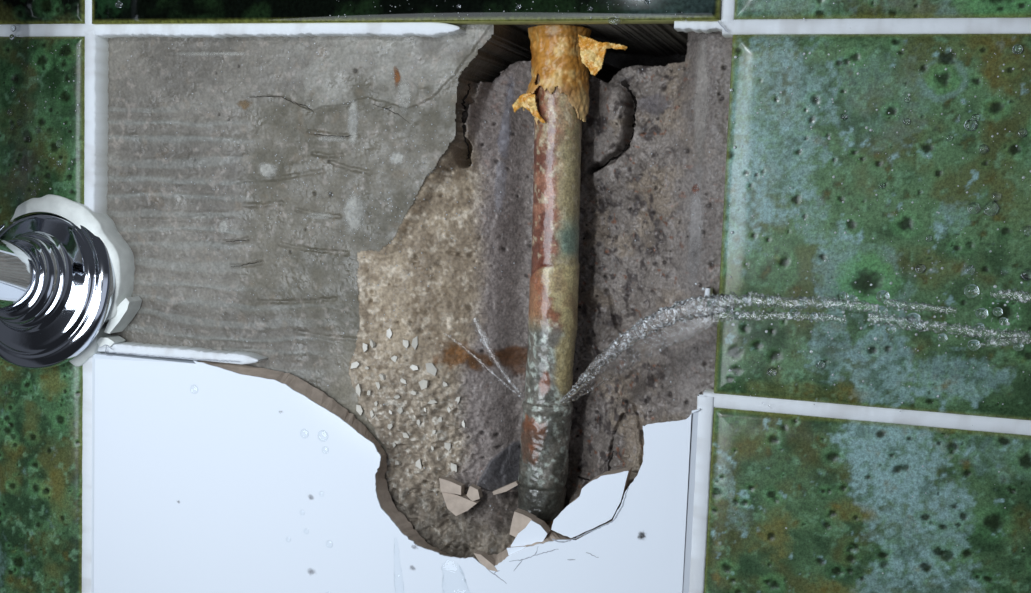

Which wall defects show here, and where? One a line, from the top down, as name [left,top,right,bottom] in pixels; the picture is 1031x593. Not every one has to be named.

crack [596,80,637,170]
peeling [97,296,142,347]
spalling [349,24,537,557]
corrosion [434,344,528,373]
spalling [564,24,732,509]